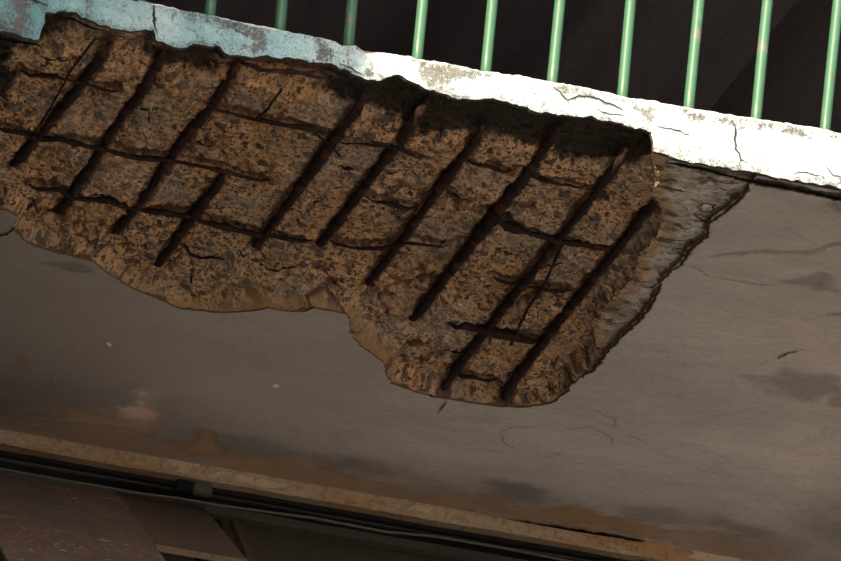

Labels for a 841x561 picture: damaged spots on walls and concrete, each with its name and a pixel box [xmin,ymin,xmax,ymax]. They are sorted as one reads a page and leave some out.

crack [0,35,41,46]
spalling [0,0,760,406]
crack [553,87,625,116]
crack [582,119,841,378]